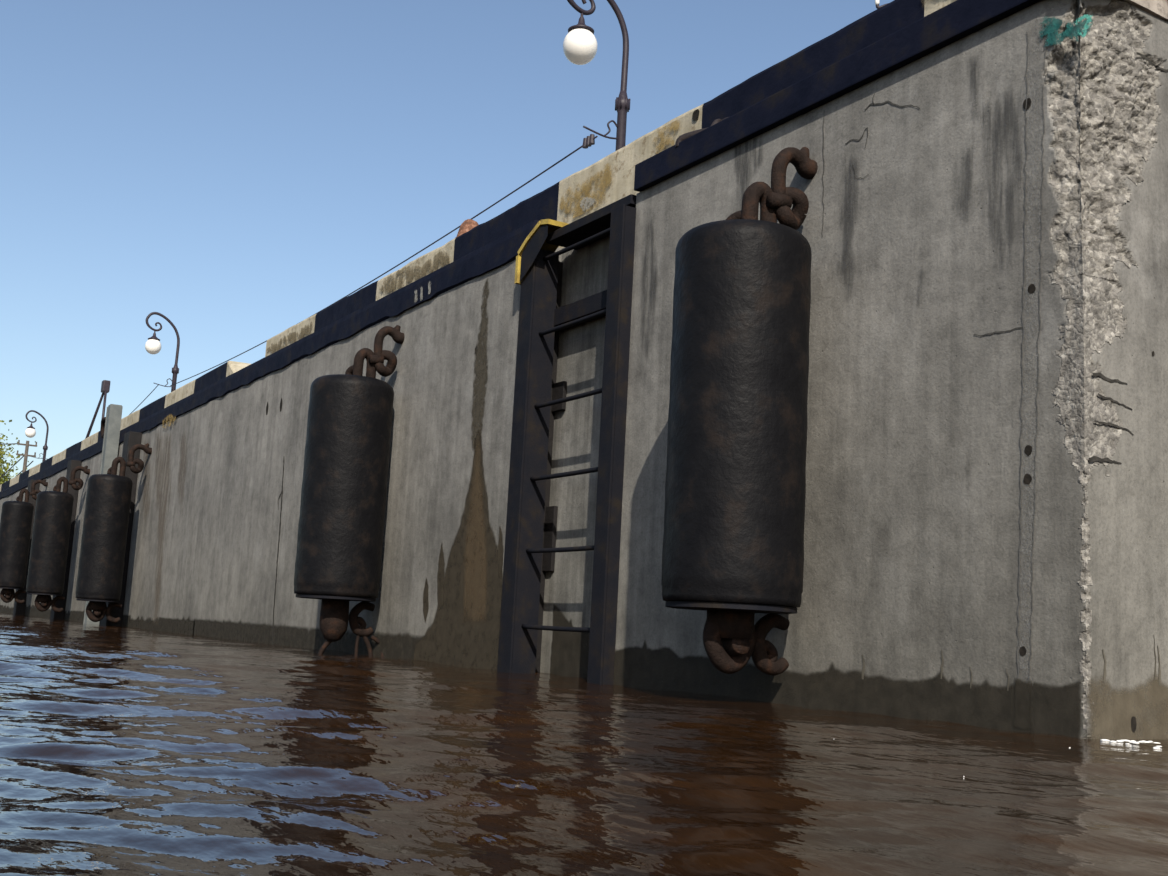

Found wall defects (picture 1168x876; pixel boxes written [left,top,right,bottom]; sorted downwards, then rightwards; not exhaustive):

crack [822,95,920,237]
spalling [1039,0,1164,731]
leakage [122,280,503,670]
leakage [0,605,84,622]
leakage [613,637,1168,740]